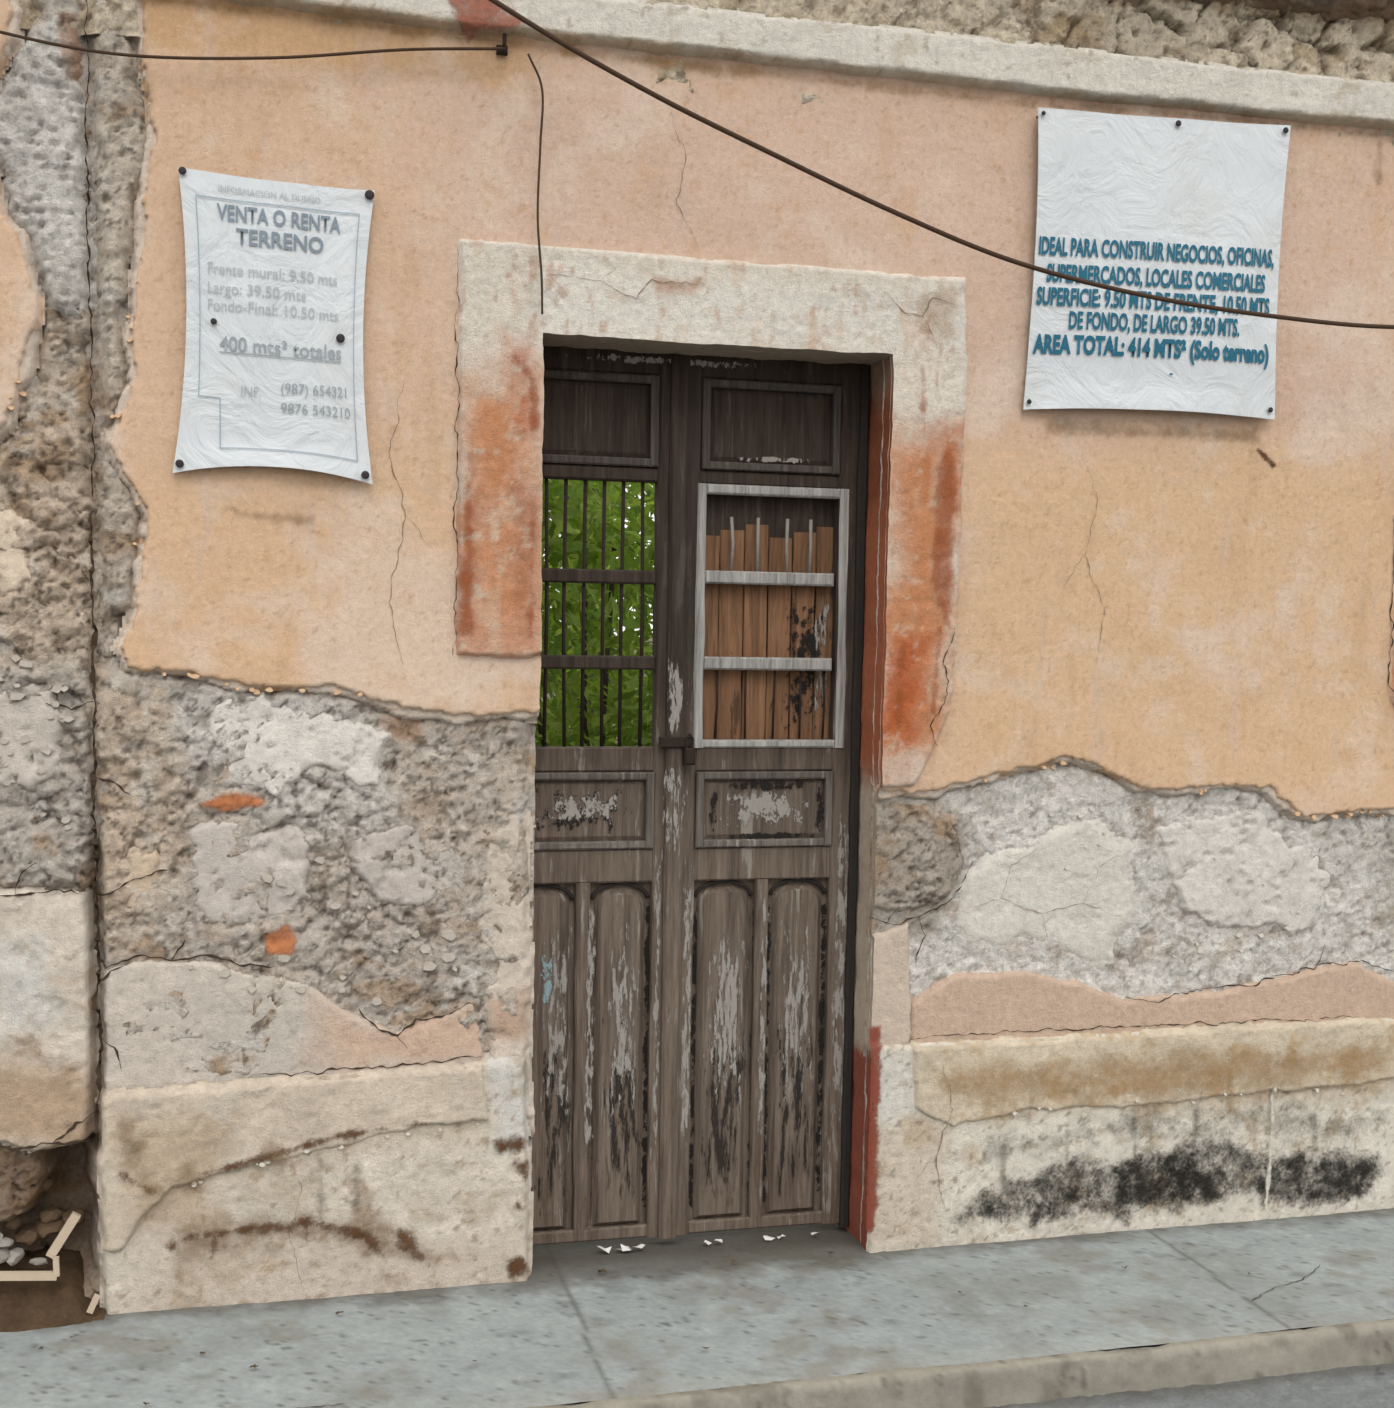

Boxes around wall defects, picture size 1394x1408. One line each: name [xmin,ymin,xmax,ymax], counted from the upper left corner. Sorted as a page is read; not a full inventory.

spalling [656,54,694,92]
spalling [646,0,1394,83]
peeling [587,353,671,365]
peeling [690,358,756,369]
peeling [740,456,808,464]
spalling [0,0,633,1076]
peeling [668,659,683,734]
peeling [783,599,830,729]
peeling [534,766,849,1215]
spalling [863,761,1394,1233]
damp [959,1087,1380,1227]